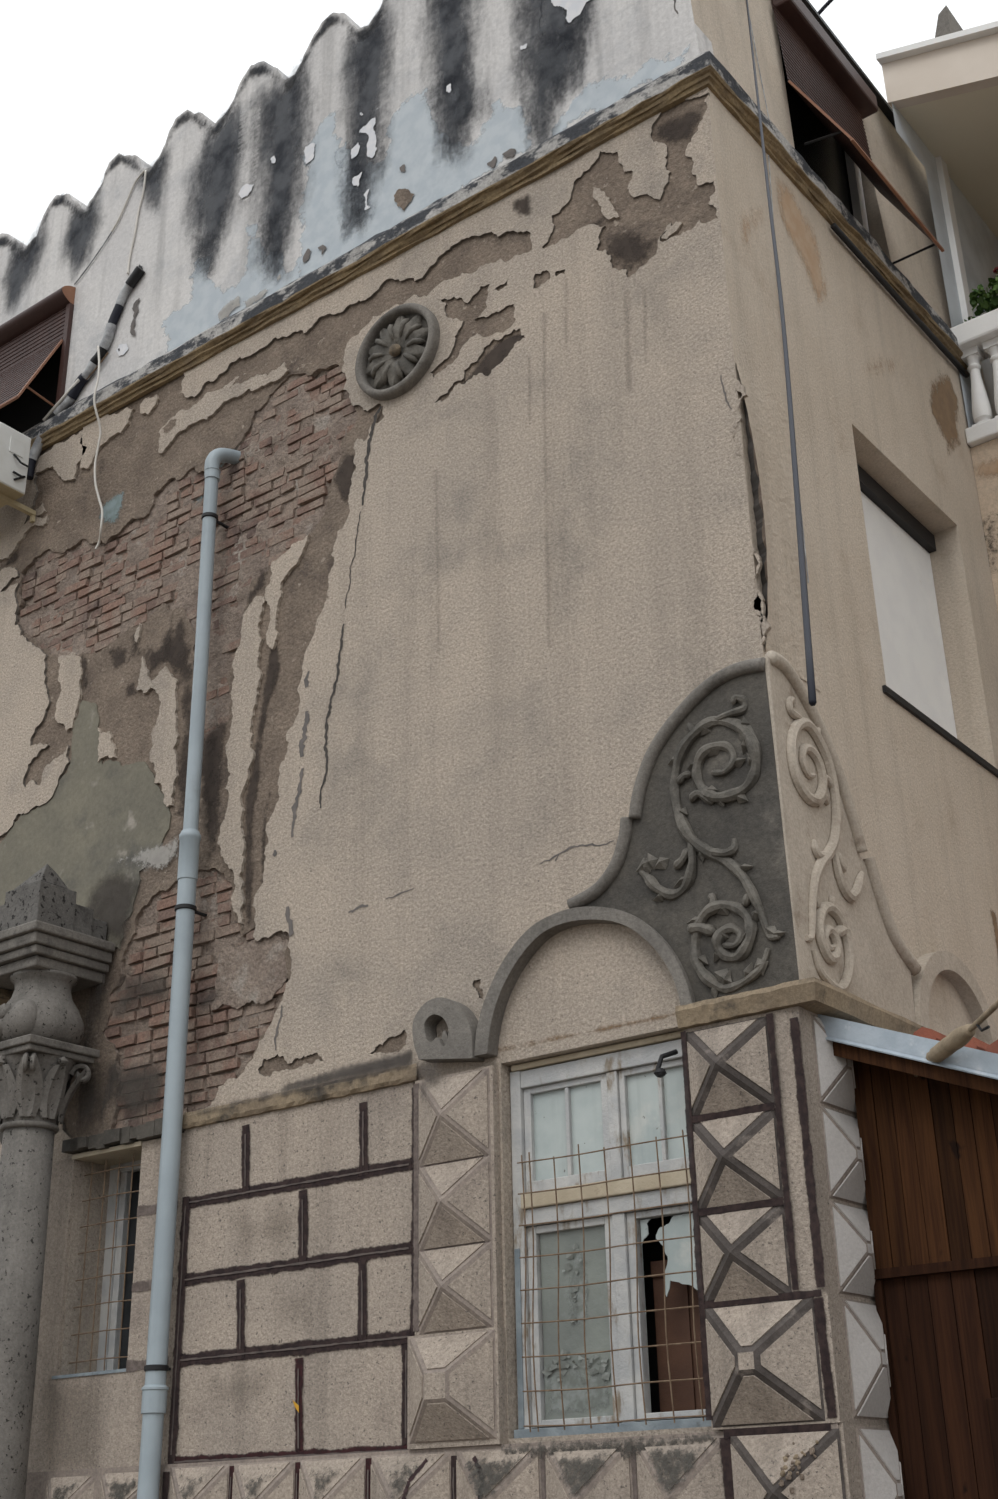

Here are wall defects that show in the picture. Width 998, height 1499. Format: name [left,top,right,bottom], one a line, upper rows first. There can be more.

peeling [551,0,590,23]
damp [344,10,391,223]
damp [427,0,474,149]
peeling [551,46,690,136]
damp [142,155,166,206]
damp [189,69,308,273]
damp [5,230,44,307]
damp [64,204,97,270]
crack [273,406,382,857]
flaking render [0,88,718,1151]
crack [539,840,614,864]
crack [285,906,294,937]